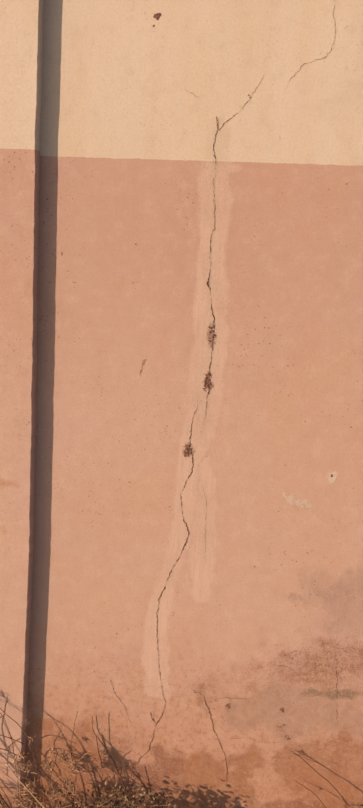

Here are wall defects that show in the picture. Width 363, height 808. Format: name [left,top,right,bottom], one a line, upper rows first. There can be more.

crack [130,75,264,791]
crack [193,690,278,777]